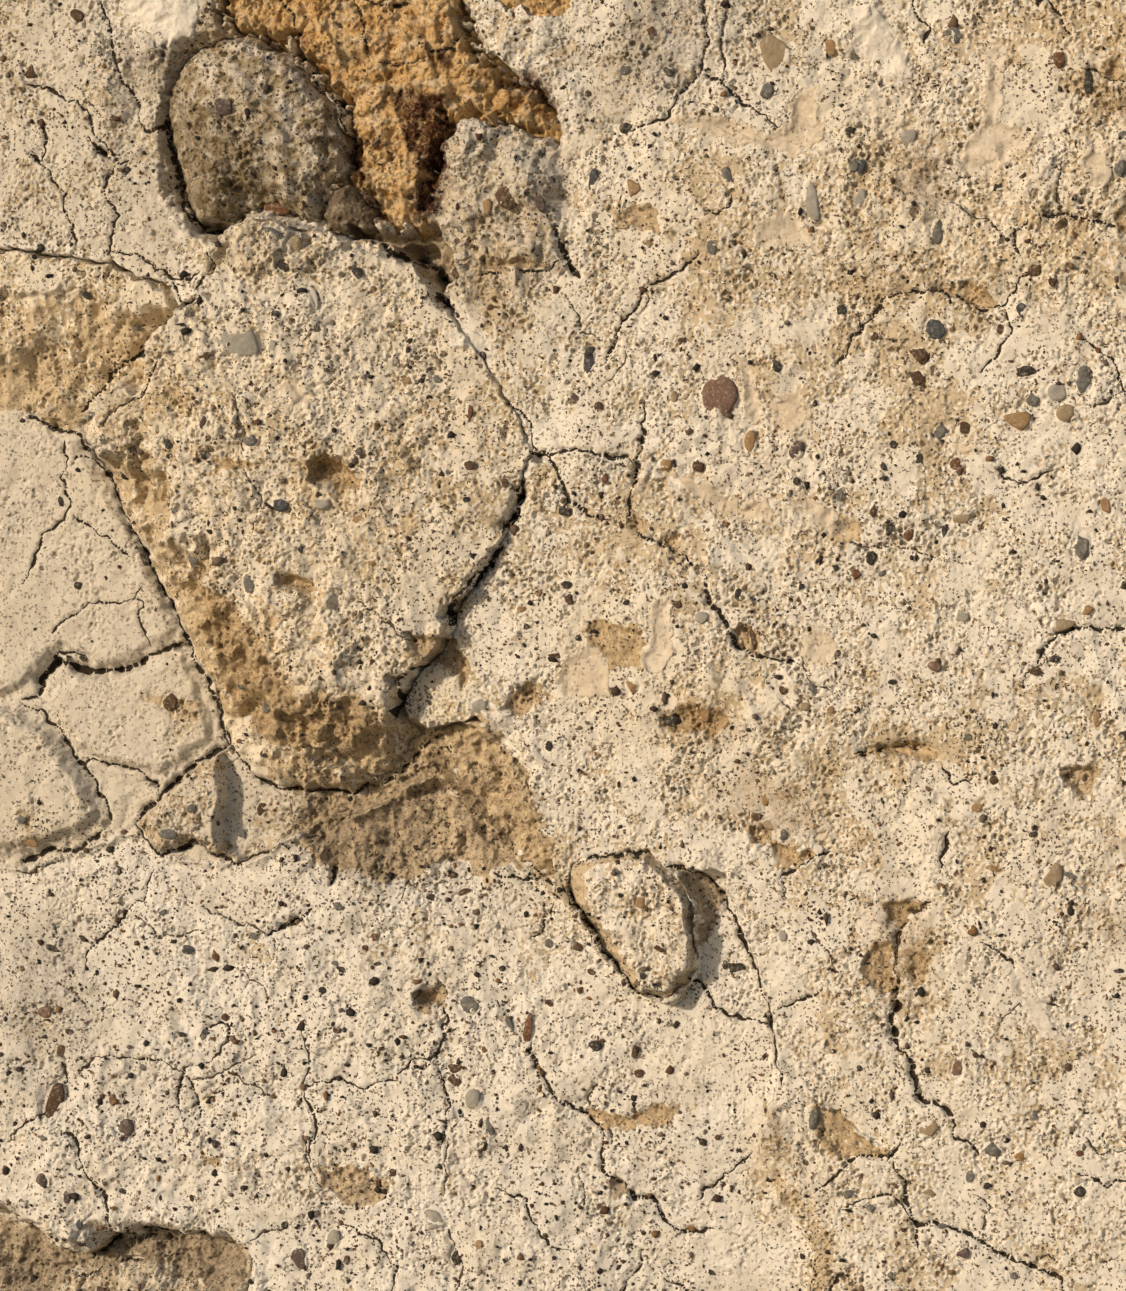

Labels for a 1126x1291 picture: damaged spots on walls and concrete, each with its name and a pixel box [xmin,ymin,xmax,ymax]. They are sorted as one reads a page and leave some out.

crack [25,1,252,310]
crack [630,0,779,132]
spalling [480,254,550,275]
crack [379,225,699,387]
crack [837,160,1116,373]
crack [18,350,844,1086]
crack [889,831,979,1156]
spalling [0,1219,253,1291]
crack [7,1112,284,1279]
crack [61,980,464,1291]
crack [528,1042,752,1234]
crack [815,1130,1065,1291]